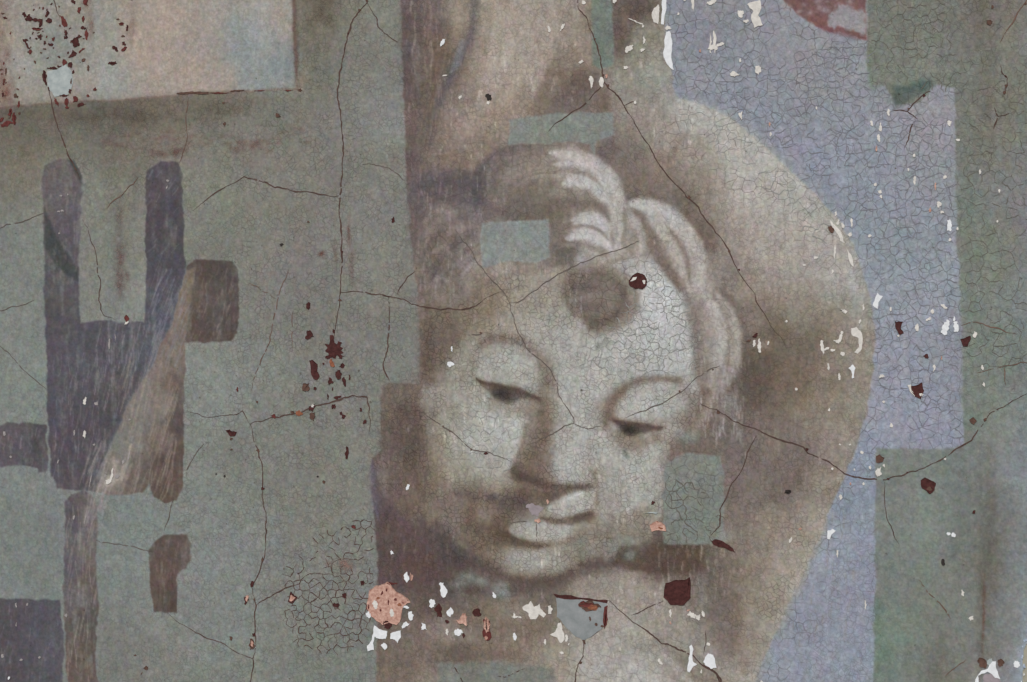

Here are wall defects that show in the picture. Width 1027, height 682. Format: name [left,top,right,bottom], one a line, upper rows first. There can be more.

peeling [625,0,680,70]
crack [894,91,930,148]
crack [548,0,784,342]
crack [87,227,115,320]
peeling [820,293,977,380]
crack [169,272,371,682]
crack [626,362,1026,544]
peeling [360,572,426,651]
peeling [429,582,492,641]
peeling [513,594,608,655]
crack [574,600,722,682]
peeling [664,577,705,624]